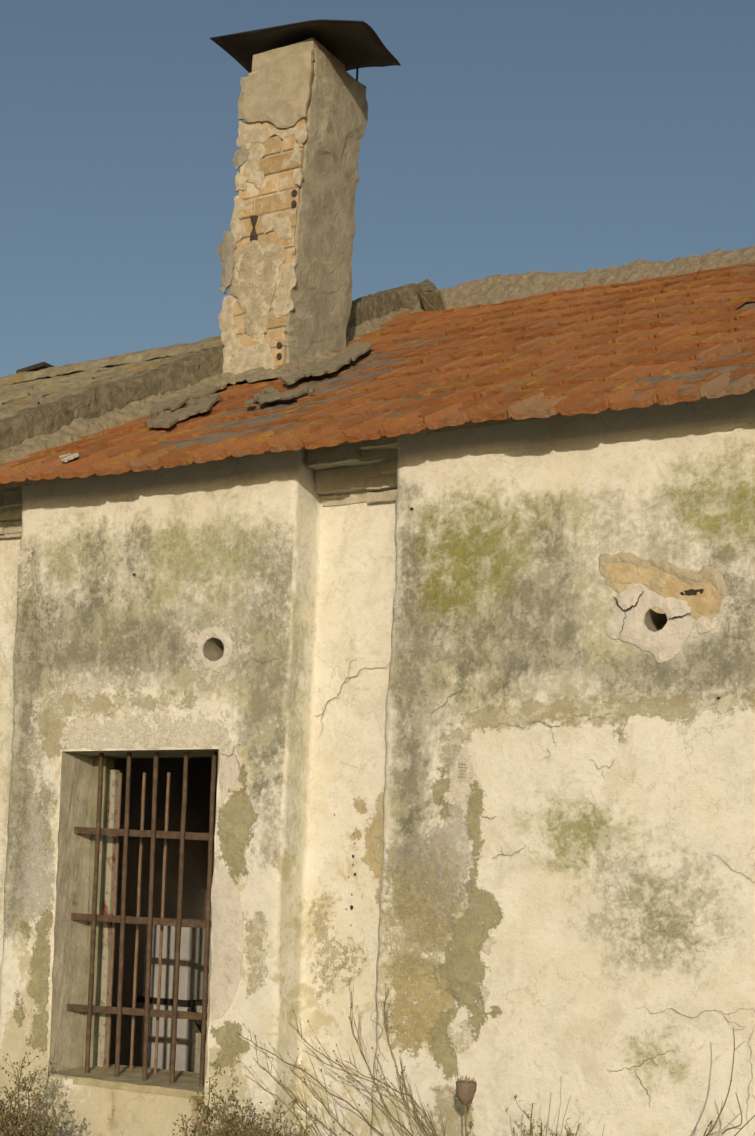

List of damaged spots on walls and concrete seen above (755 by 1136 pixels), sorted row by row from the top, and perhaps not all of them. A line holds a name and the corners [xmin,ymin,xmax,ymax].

flaking render [217,230,287,339]
flaking render [144,384,227,428]
flaking render [245,310,375,406]
spalling [598,552,728,633]
damp [183,611,252,690]
crack [314,657,389,736]
damp [13,675,231,923]
damp [386,690,755,927]
flaking render [209,742,269,1072]
peeling [308,893,366,1004]
peeling [348,763,504,1136]